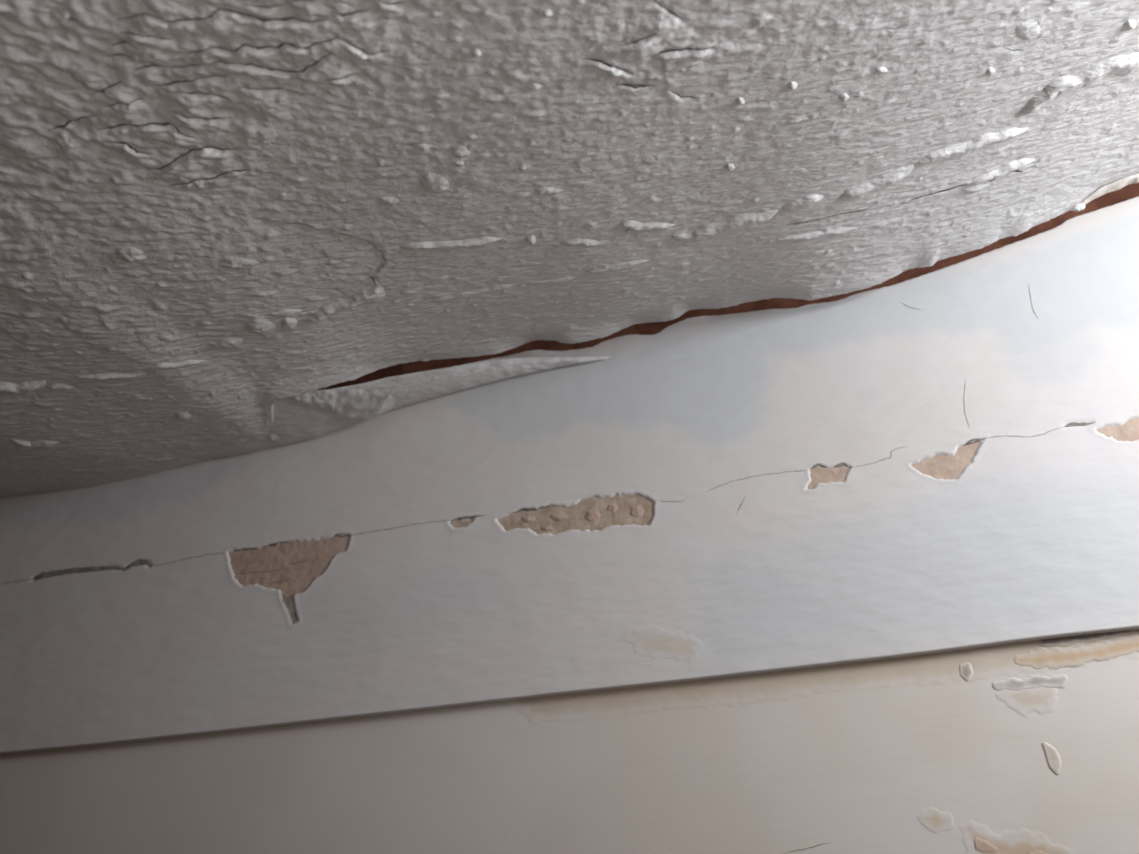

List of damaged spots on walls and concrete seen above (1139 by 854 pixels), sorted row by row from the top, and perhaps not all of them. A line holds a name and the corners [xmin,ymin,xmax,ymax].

crack [909,170,1023,201]
crack [786,206,872,226]
crack [1064,420,1095,428]
flaking render [1096,418,1139,442]
flaking render [705,446,908,492]
flaking render [911,427,1063,480]
flaking render [497,494,686,534]
crack [0,552,228,585]
flaking render [229,515,484,624]